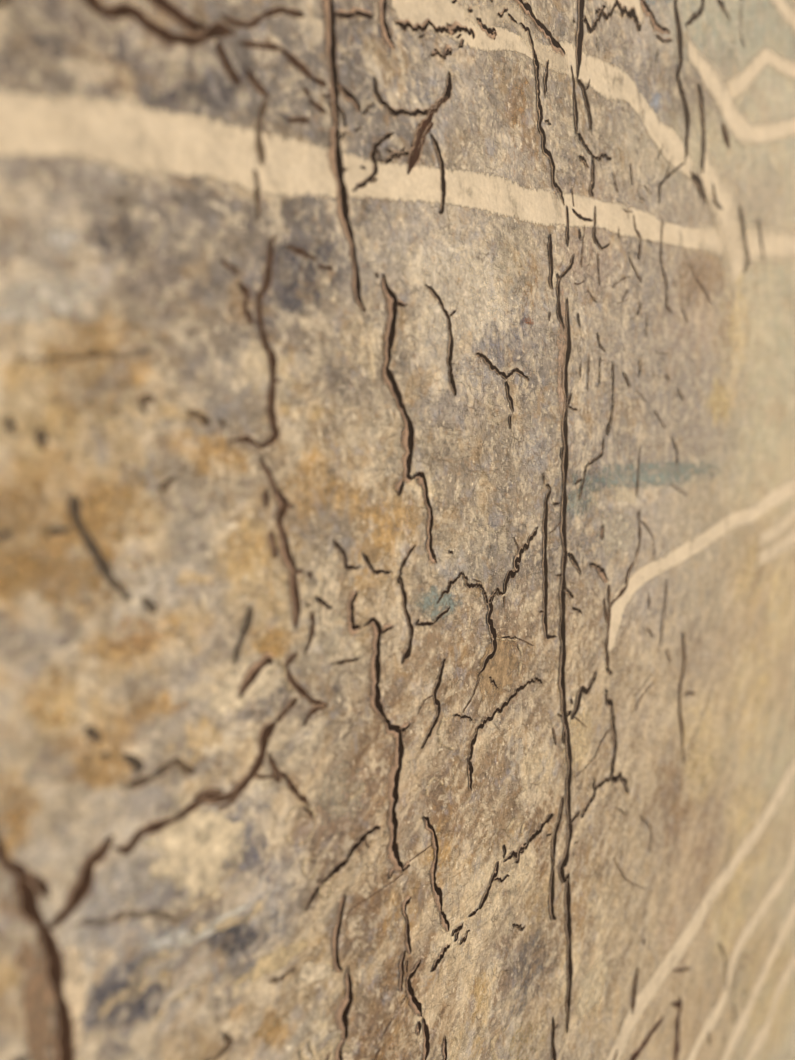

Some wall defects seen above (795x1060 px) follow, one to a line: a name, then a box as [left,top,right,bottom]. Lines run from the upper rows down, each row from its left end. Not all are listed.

crack [84,0,497,312]
crack [722,123,730,148]
crack [718,0,744,47]
crack [738,205,765,273]
crack [0,234,333,1060]
crack [306,0,723,1060]